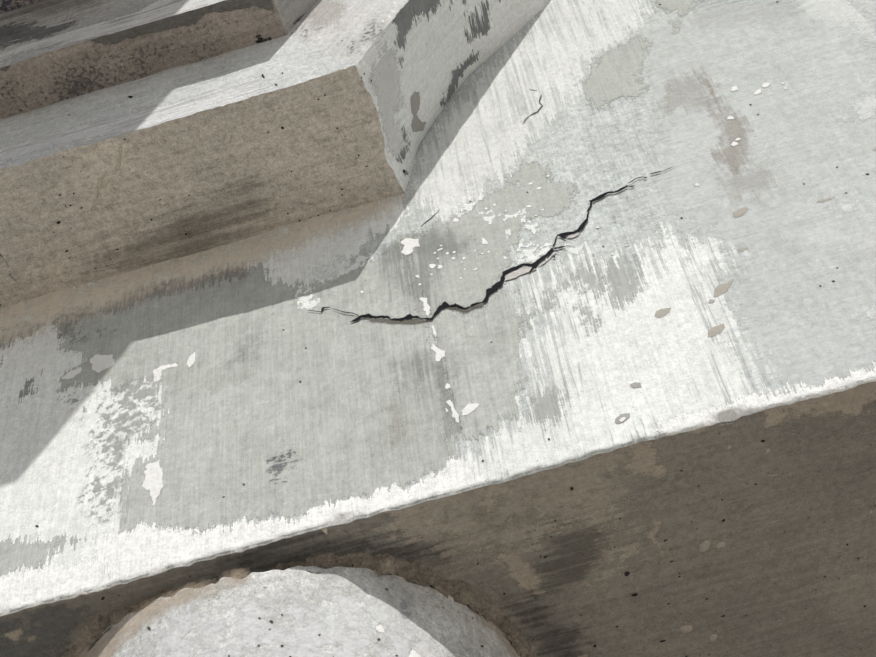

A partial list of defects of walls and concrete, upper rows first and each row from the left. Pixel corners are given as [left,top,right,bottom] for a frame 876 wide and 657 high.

crack [307,167,672,323]